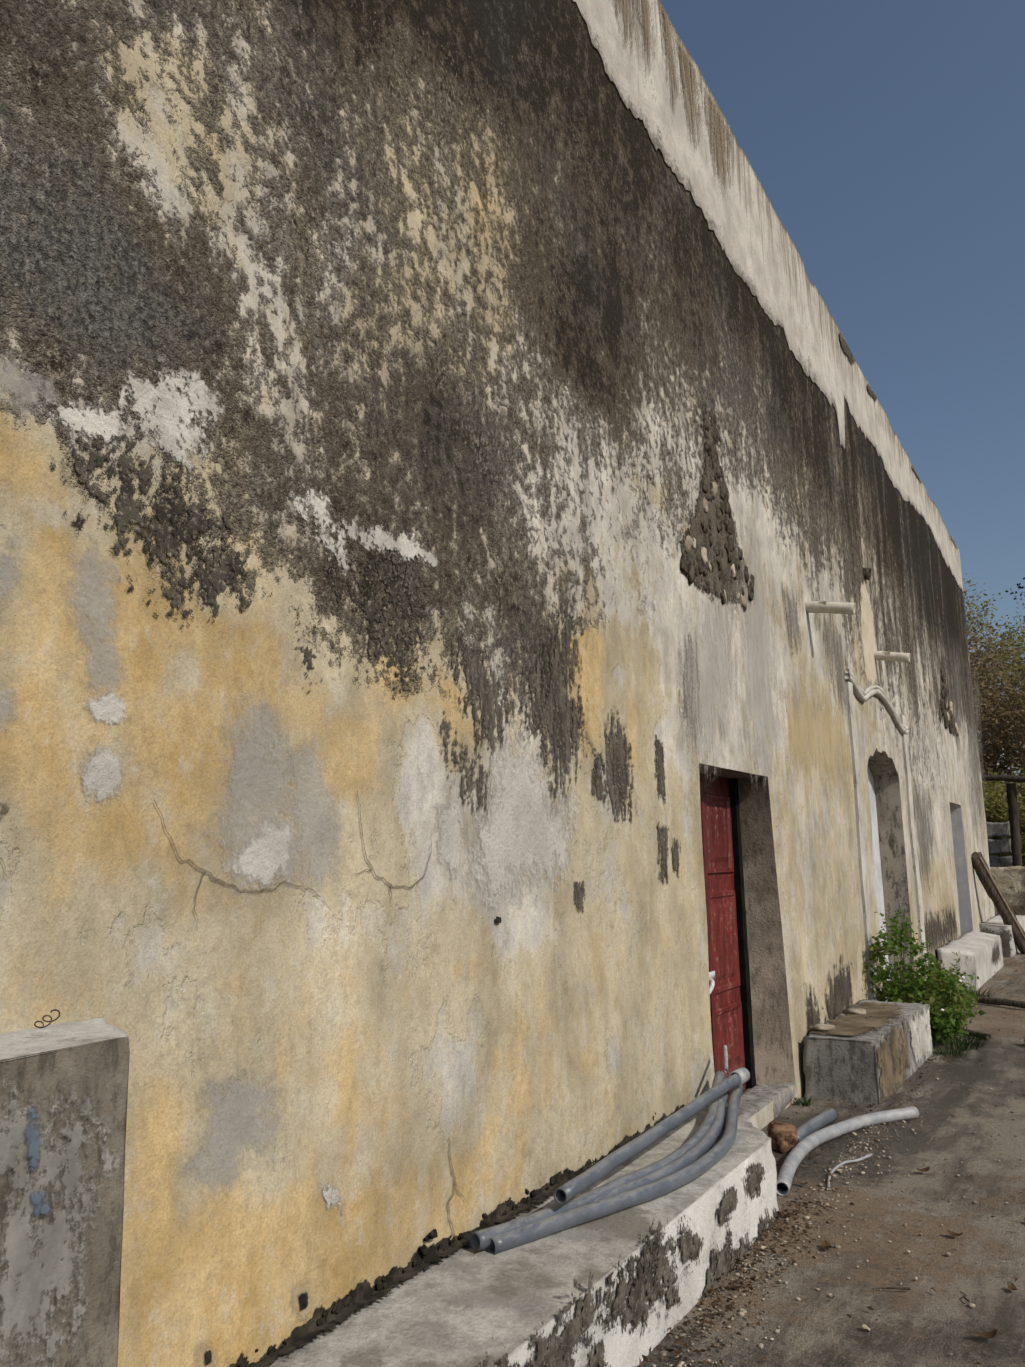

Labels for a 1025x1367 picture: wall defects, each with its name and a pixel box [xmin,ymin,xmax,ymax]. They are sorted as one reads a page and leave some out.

water stain [50,415,272,632]
spalling [680,406,757,612]
water stain [292,609,323,694]
water stain [324,520,637,822]
water stain [655,735,666,804]
water stain [679,634,705,747]
water stain [782,583,801,654]
water stain [823,581,880,710]
water stain [950,643,985,843]
crack [154,800,321,930]
crack [356,791,432,904]
water stain [657,823,681,884]